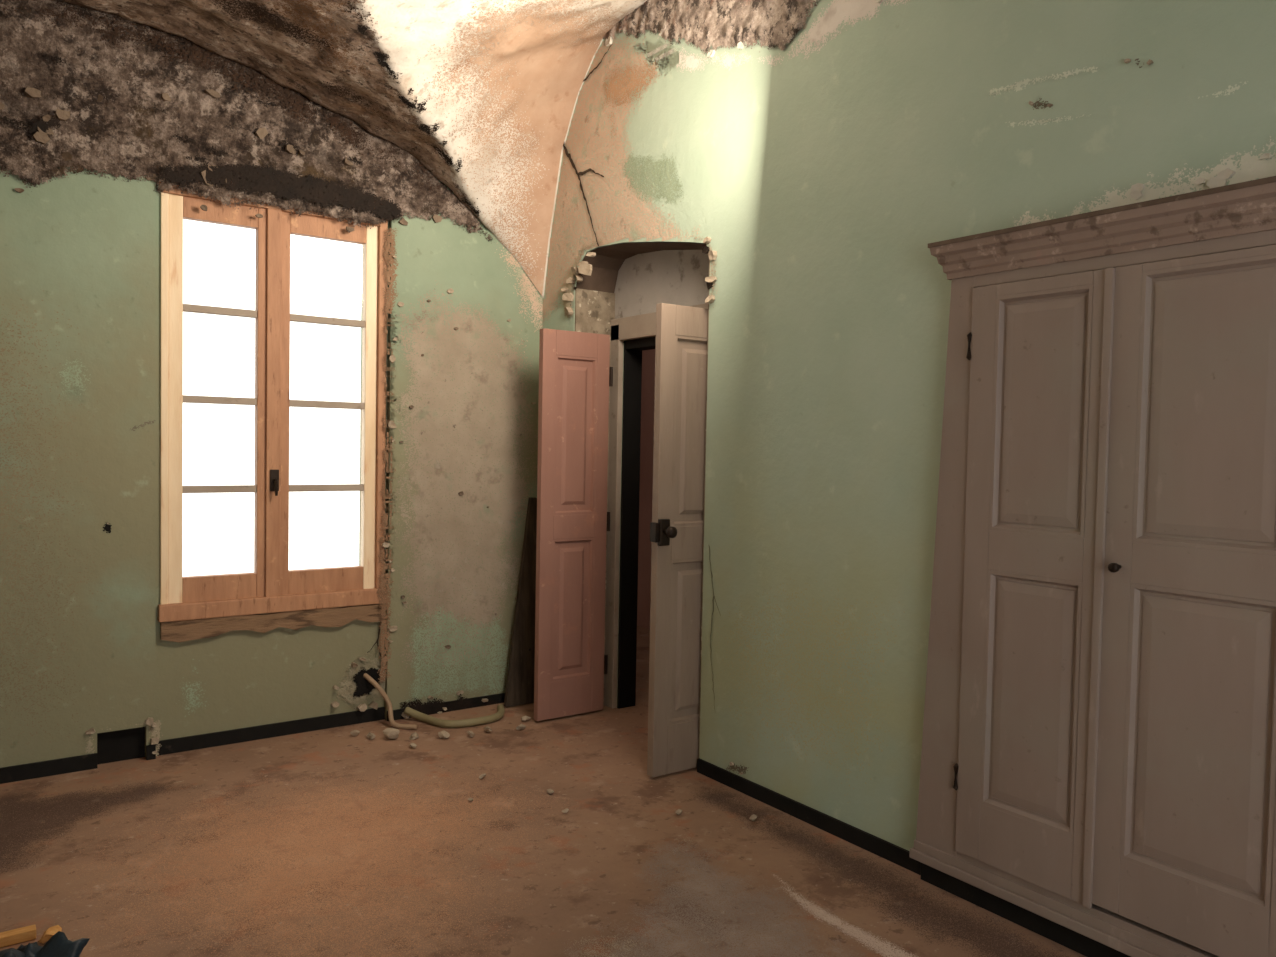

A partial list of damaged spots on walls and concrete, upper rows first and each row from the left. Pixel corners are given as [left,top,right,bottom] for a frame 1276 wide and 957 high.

peeling [989,66,1098,127]
crack [563,142,604,247]
peeling [1013,136,1276,227]
spalling [0,0,910,718]